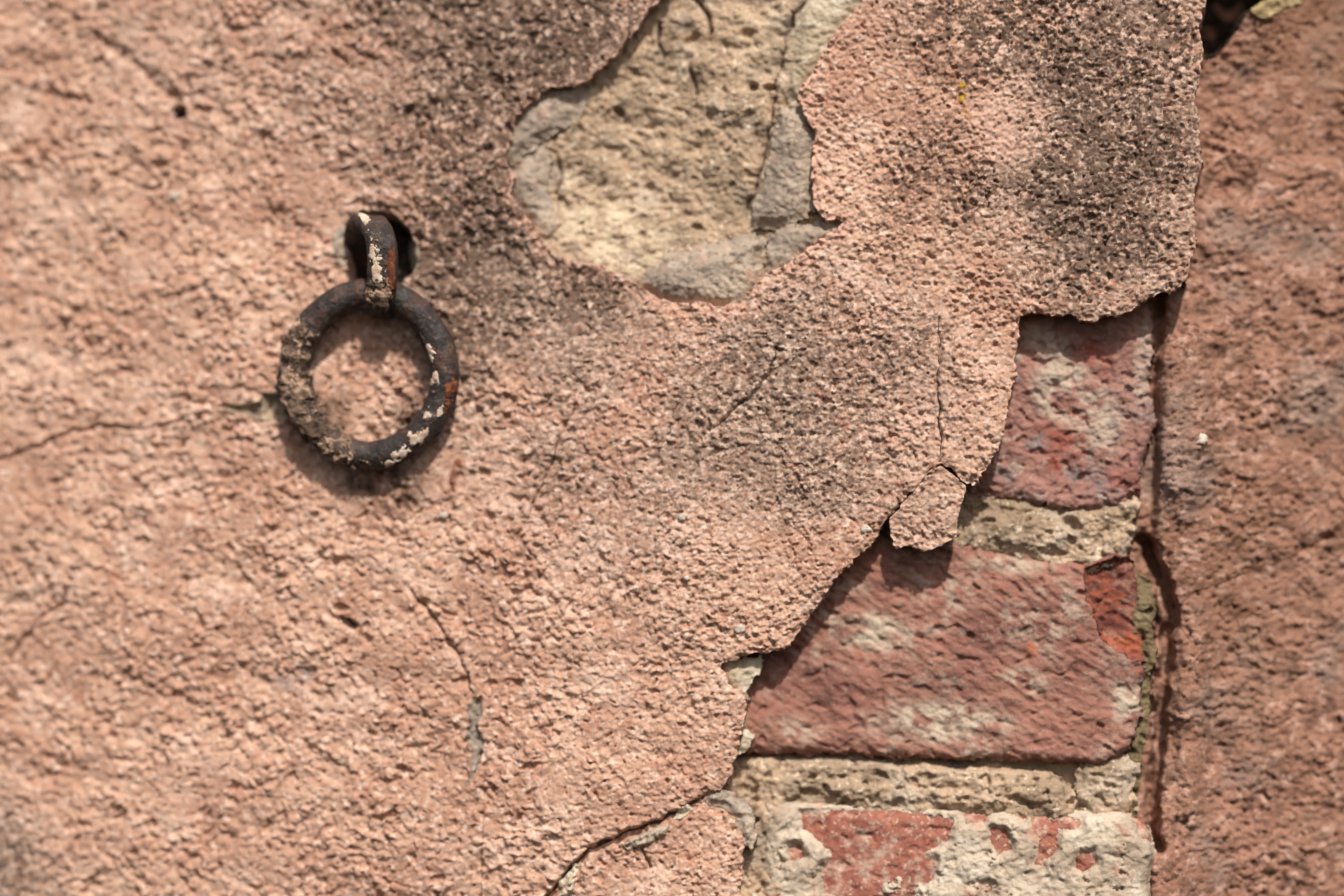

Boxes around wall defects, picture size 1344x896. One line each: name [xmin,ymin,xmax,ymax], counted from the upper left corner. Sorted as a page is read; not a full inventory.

flaking render [507,0,862,306]
corrosion [384,240,396,301]
crack [0,414,192,459]
corrosion [441,369,458,416]
crack [408,587,475,697]
flaking render [705,298,1157,896]
crack [546,795,705,896]